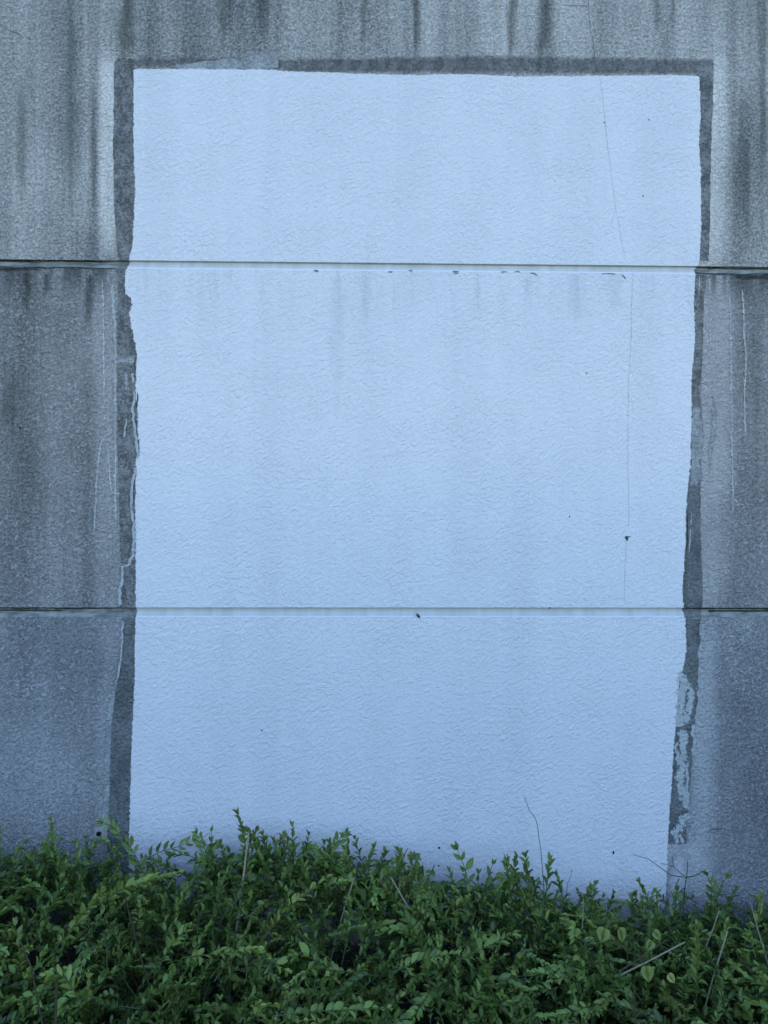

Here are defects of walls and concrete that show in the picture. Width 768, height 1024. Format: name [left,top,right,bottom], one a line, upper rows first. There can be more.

damp [0,53,714,884]
damp [682,267,768,618]
peeling [668,619,701,844]